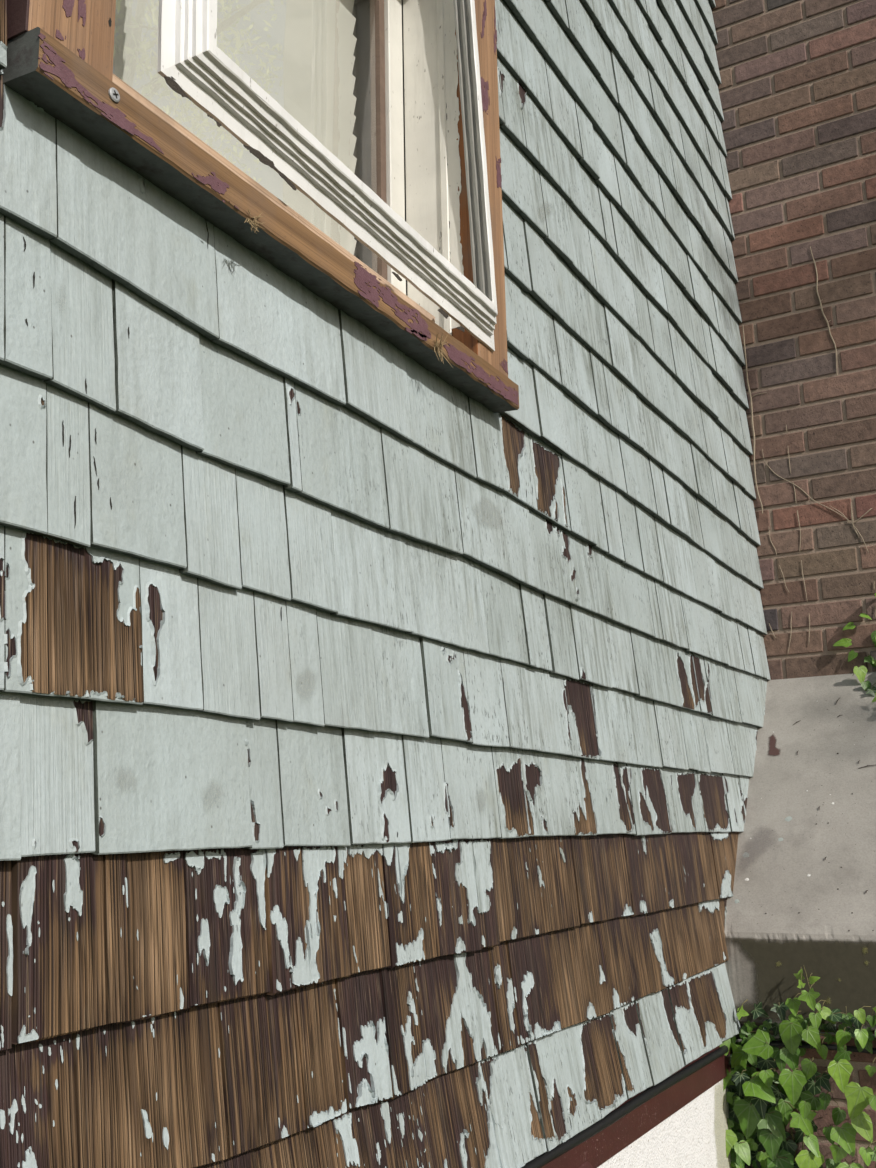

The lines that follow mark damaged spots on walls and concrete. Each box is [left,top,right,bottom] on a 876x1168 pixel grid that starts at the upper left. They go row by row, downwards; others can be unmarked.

peeling [62,0,86,26]
peeling [38,29,164,154]
peeling [192,172,239,210]
peeling [443,0,464,275]
peeling [480,0,527,115]
peeling [354,261,431,341]
peeling [443,342,519,405]
peeling [500,414,579,601]
peeling [0,531,165,746]
peeling [440,647,473,741]
peeling [676,652,712,714]
peeling [0,667,748,1168]